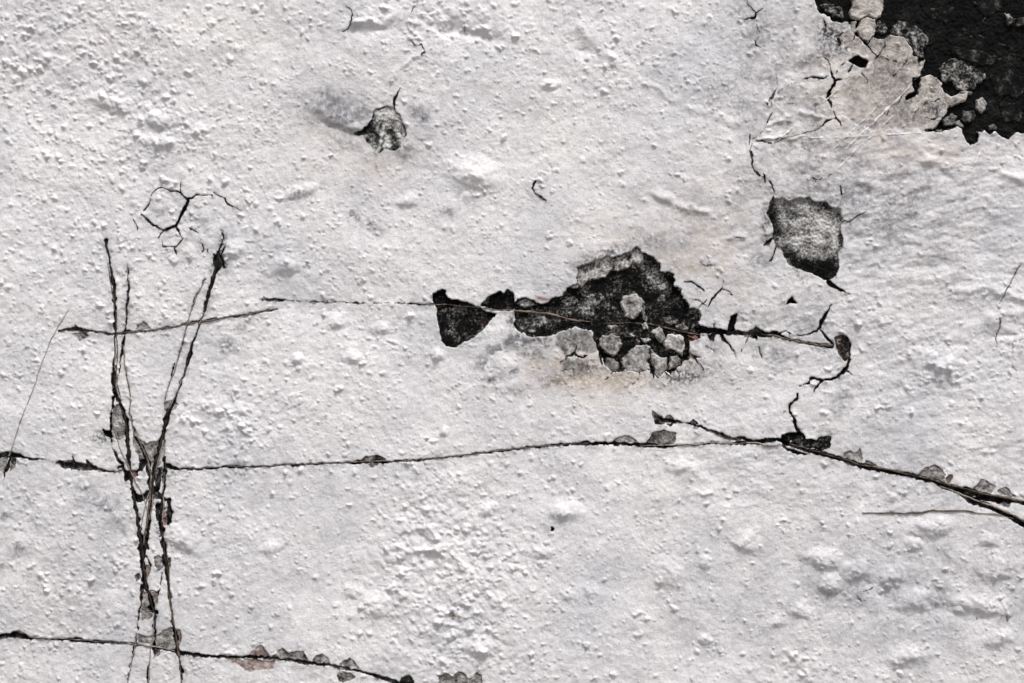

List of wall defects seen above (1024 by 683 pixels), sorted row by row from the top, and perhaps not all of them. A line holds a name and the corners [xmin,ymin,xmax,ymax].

spalling [353,106,407,153]
crack [744,0,940,200]
spalling [814,0,1024,145]
spalling [765,197,843,280]
spalling [432,246,704,378]
crack [0,174,1024,683]